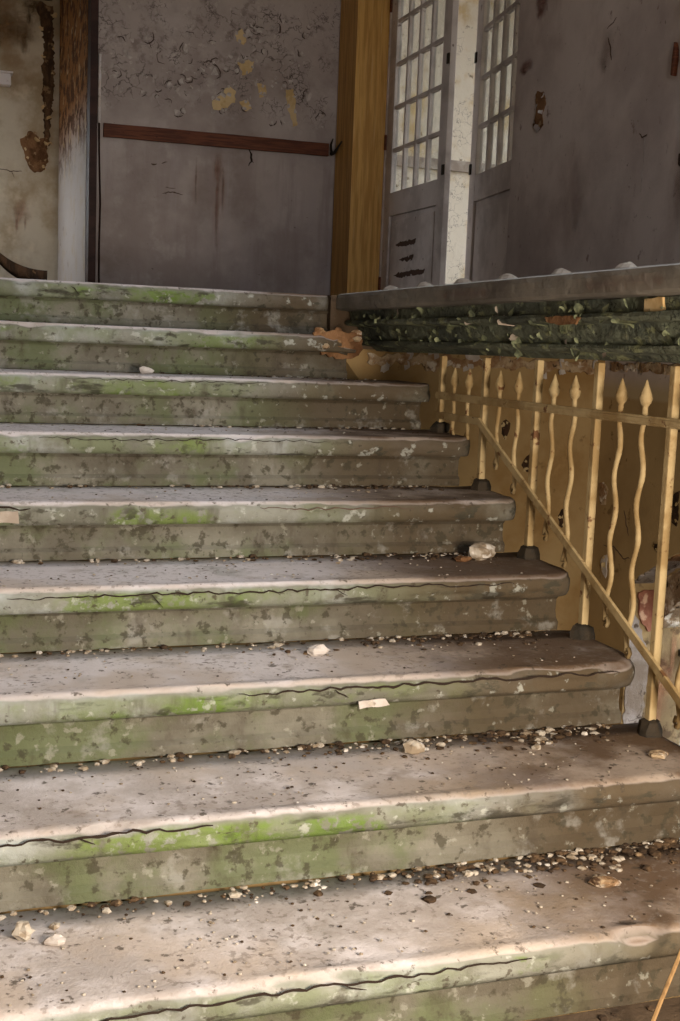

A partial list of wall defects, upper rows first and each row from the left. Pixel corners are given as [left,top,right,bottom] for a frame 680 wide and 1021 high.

flaking render [20,1,57,173]
peeling [109,14,312,127]
flaking render [533,90,546,133]
flaking render [312,299,680,379]
flaking render [644,296,666,312]